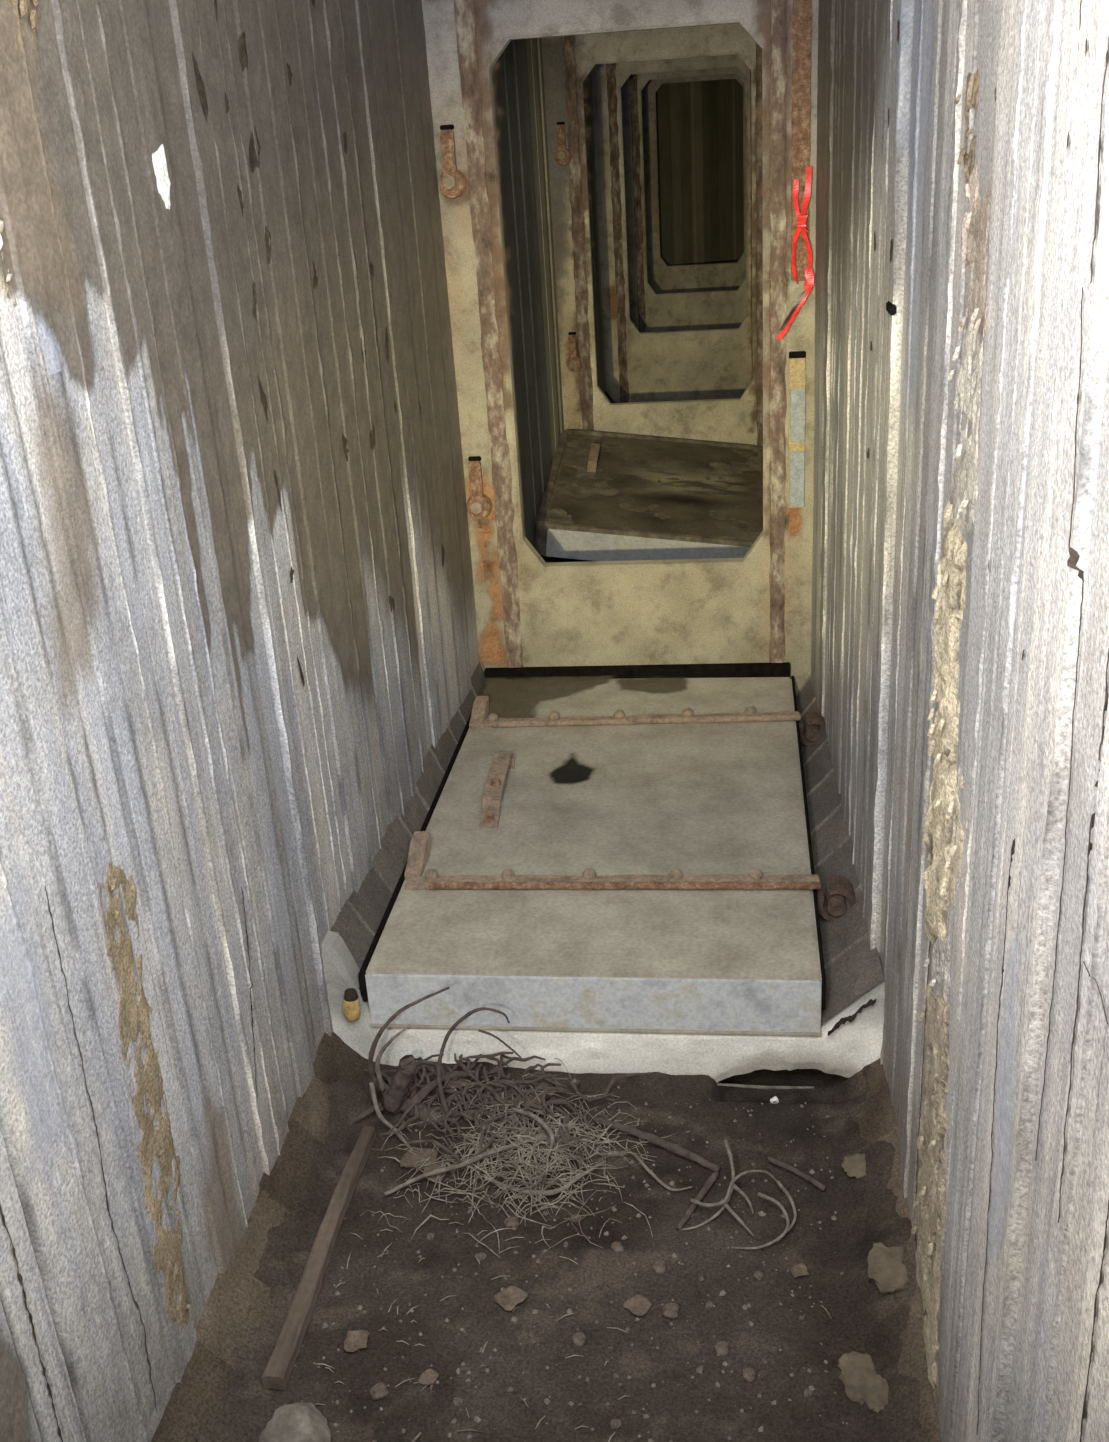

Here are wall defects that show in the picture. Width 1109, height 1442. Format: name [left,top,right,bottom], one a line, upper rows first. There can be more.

spalling [0,253,17,308]
corrosion [448,0,511,409]
corrosion [750,0,792,445]
corrosion [468,480,506,663]
corrosion [767,484,801,536]
crack [1035,0,1109,1223]
water stain [551,758,593,783]
spalling [867,69,996,1397]
crack [0,1205,63,1442]
crack [1080,1200,1109,1442]